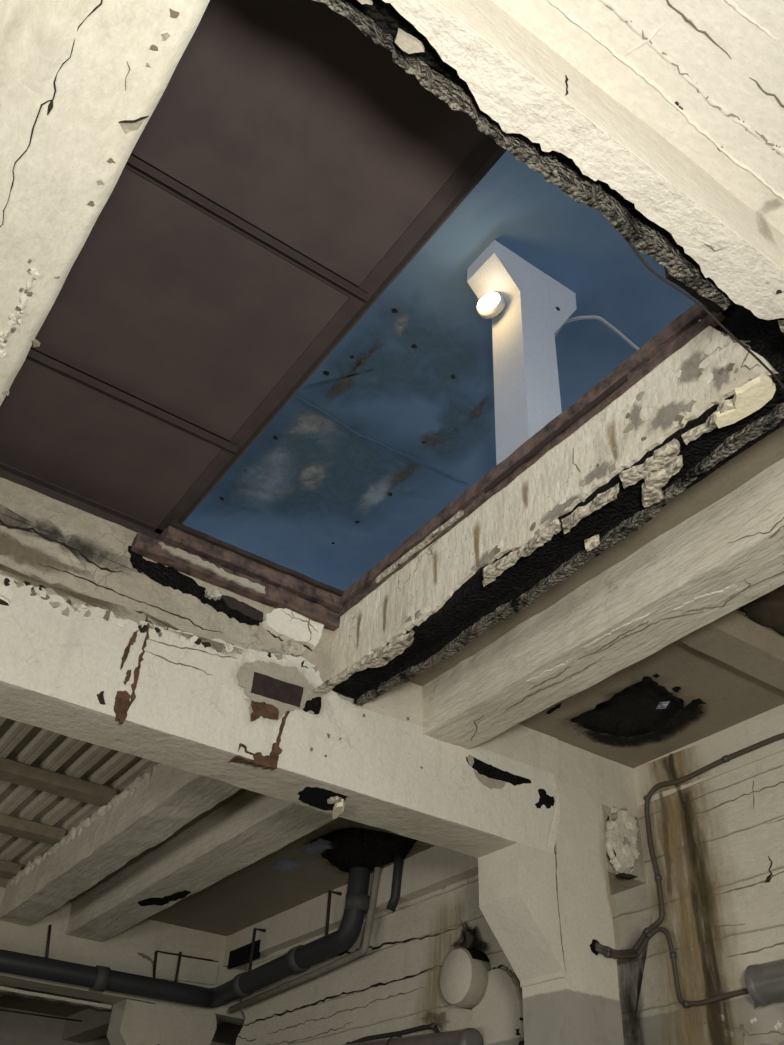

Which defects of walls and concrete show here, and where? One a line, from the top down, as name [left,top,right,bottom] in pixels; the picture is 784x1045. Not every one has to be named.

crack [0,0,103,227]
peeling [395,28,425,54]
crack [605,0,784,155]
spalling [357,234,784,717]
leakage [0,515,108,608]
spalling [128,546,263,626]
rust [97,614,150,724]
spalling [179,635,322,770]
crack [680,781,784,824]
leakage [653,750,735,1045]
crack [717,856,784,895]
leakage [621,952,646,1045]